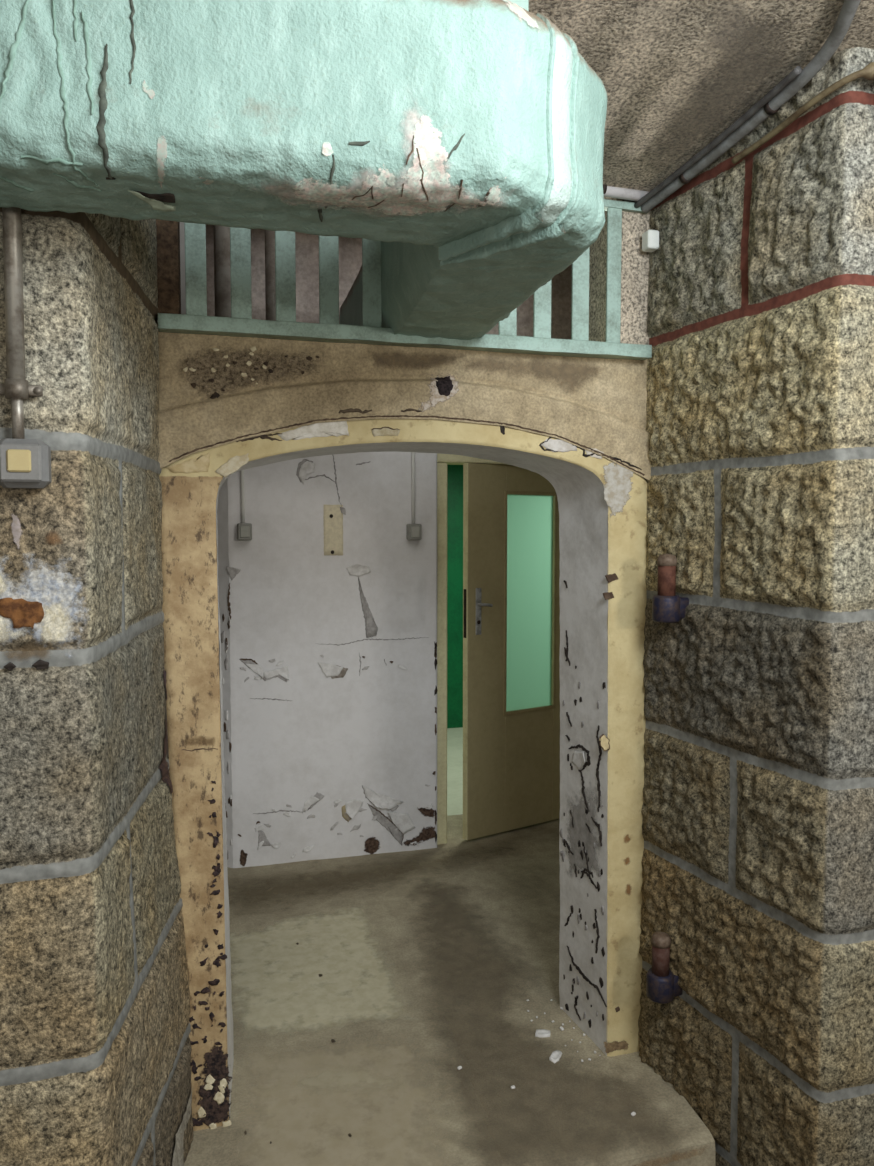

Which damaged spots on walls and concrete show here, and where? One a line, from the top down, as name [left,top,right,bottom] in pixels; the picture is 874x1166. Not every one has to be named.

crack [96,0,136,180]
peeling [268,112,506,216]
spalling [420,375,459,412]
peeling [278,421,349,441]
peeling [539,437,634,516]
peeling [318,655,348,679]
peeling [253,785,437,850]
leakage [404,807,436,846]
crack [560,630,607,1028]
leakage [232,837,513,906]
leakage [421,883,671,1166]